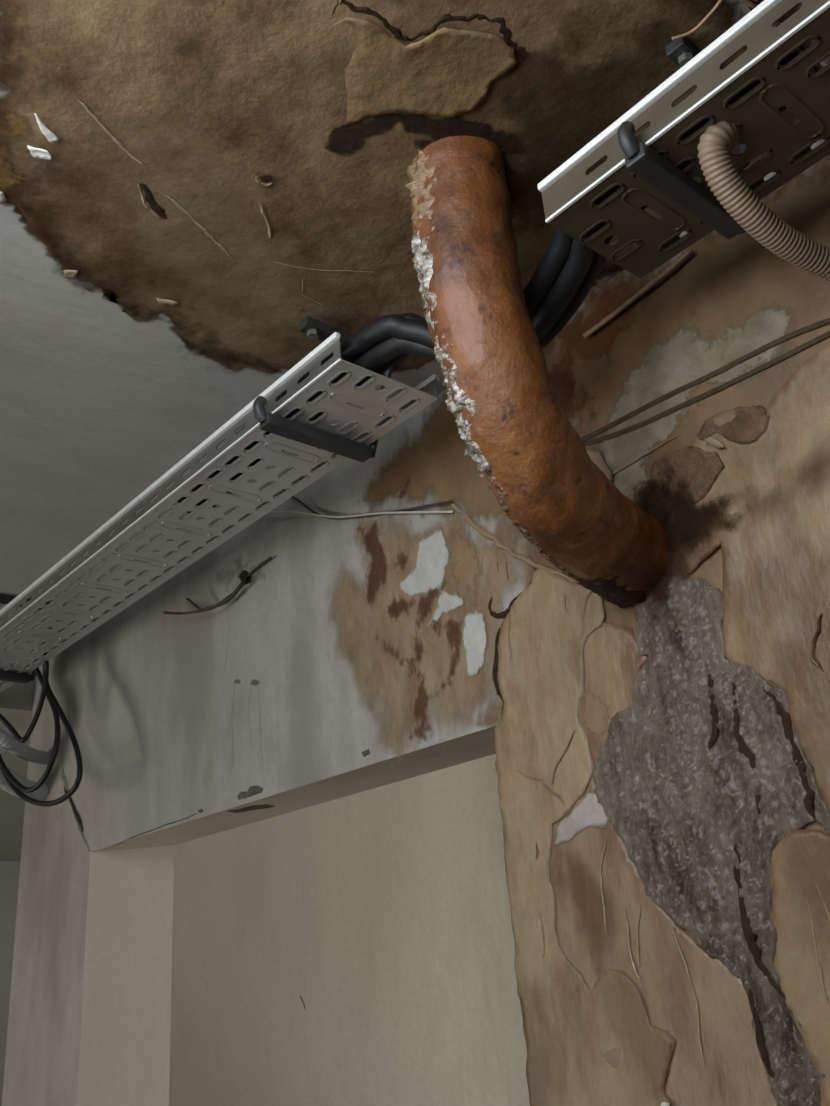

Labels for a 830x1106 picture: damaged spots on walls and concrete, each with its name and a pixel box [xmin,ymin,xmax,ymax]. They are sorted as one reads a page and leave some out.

peeling [330,17,518,128]
crack [332,0,529,58]
damp [721,46,747,69]
peeling [27,113,59,161]
damp [761,156,830,247]
peeling [64,270,78,279]
damp [0,0,742,593]
damp [542,230,830,505]
damp [603,599,636,631]
spalling [400,342,830,1106]